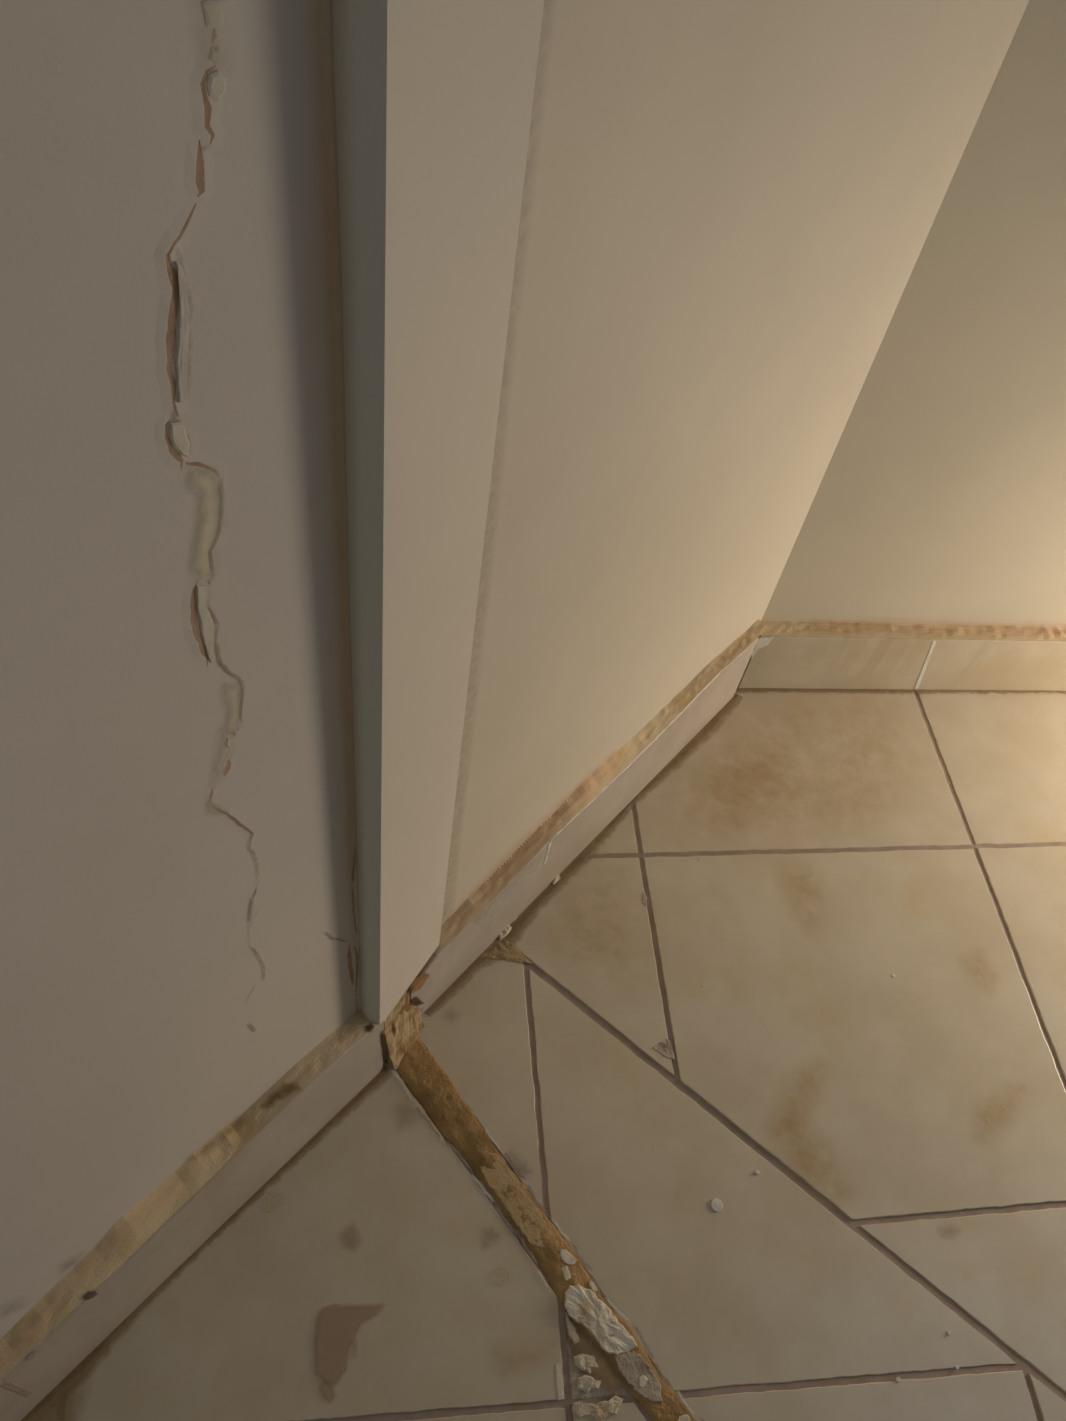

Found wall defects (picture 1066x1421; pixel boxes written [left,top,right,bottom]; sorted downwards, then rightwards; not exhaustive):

crack [153,0,265,976]
spalling [486,1129,704,1421]